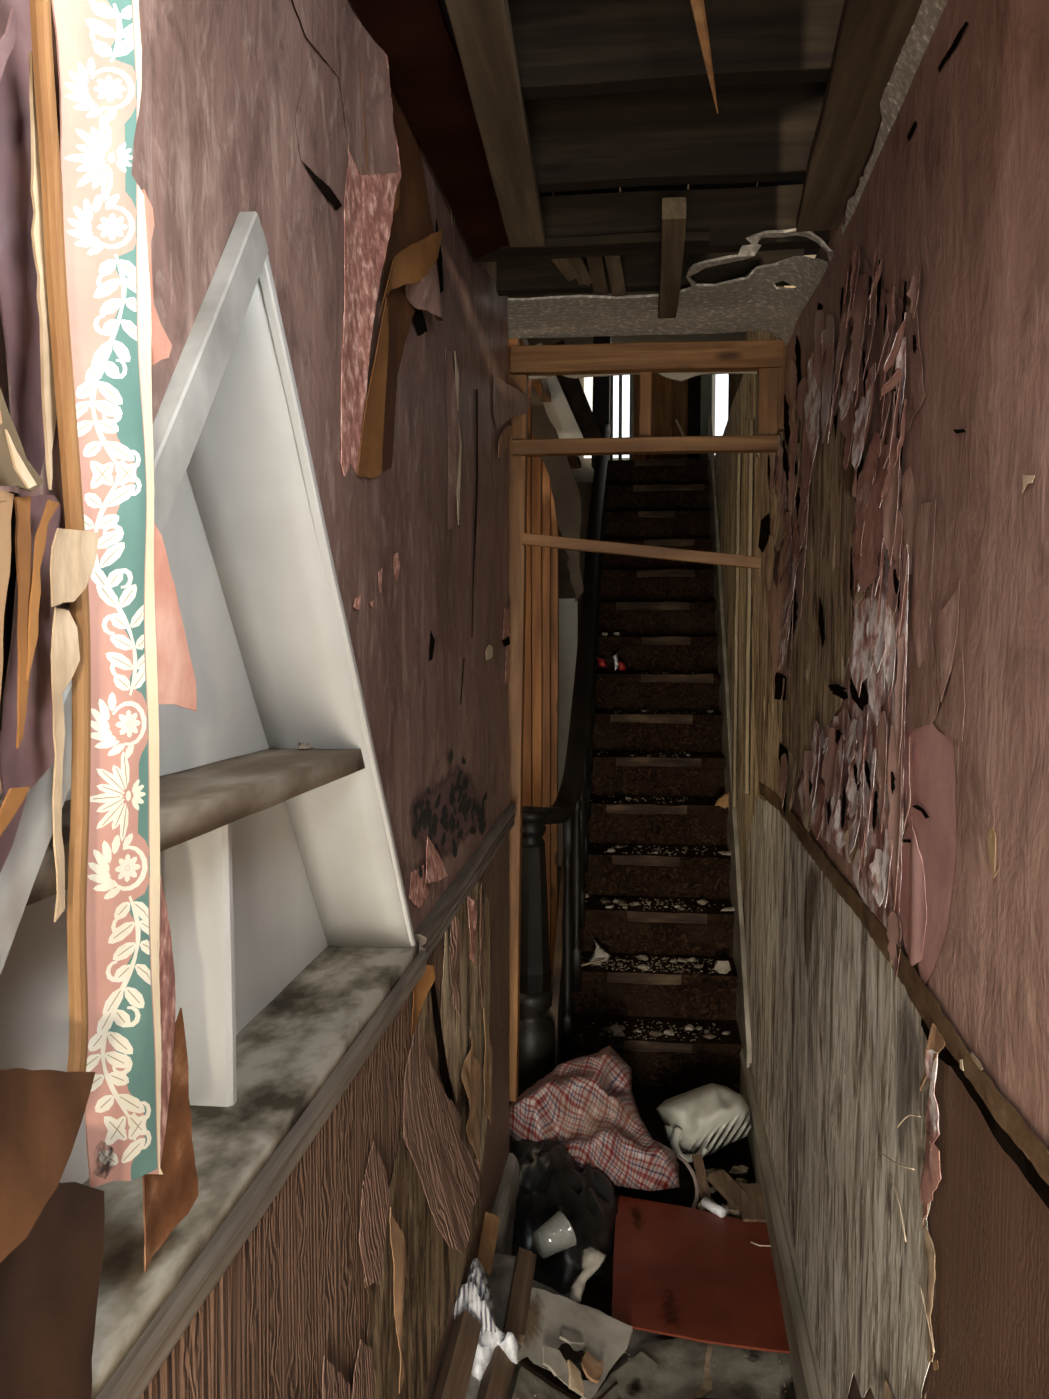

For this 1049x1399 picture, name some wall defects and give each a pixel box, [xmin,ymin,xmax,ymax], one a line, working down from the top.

peeling [0,388,44,491]
water stain [410,750,487,858]
spalling [745,244,965,1399]
peeling [411,964,436,1035]